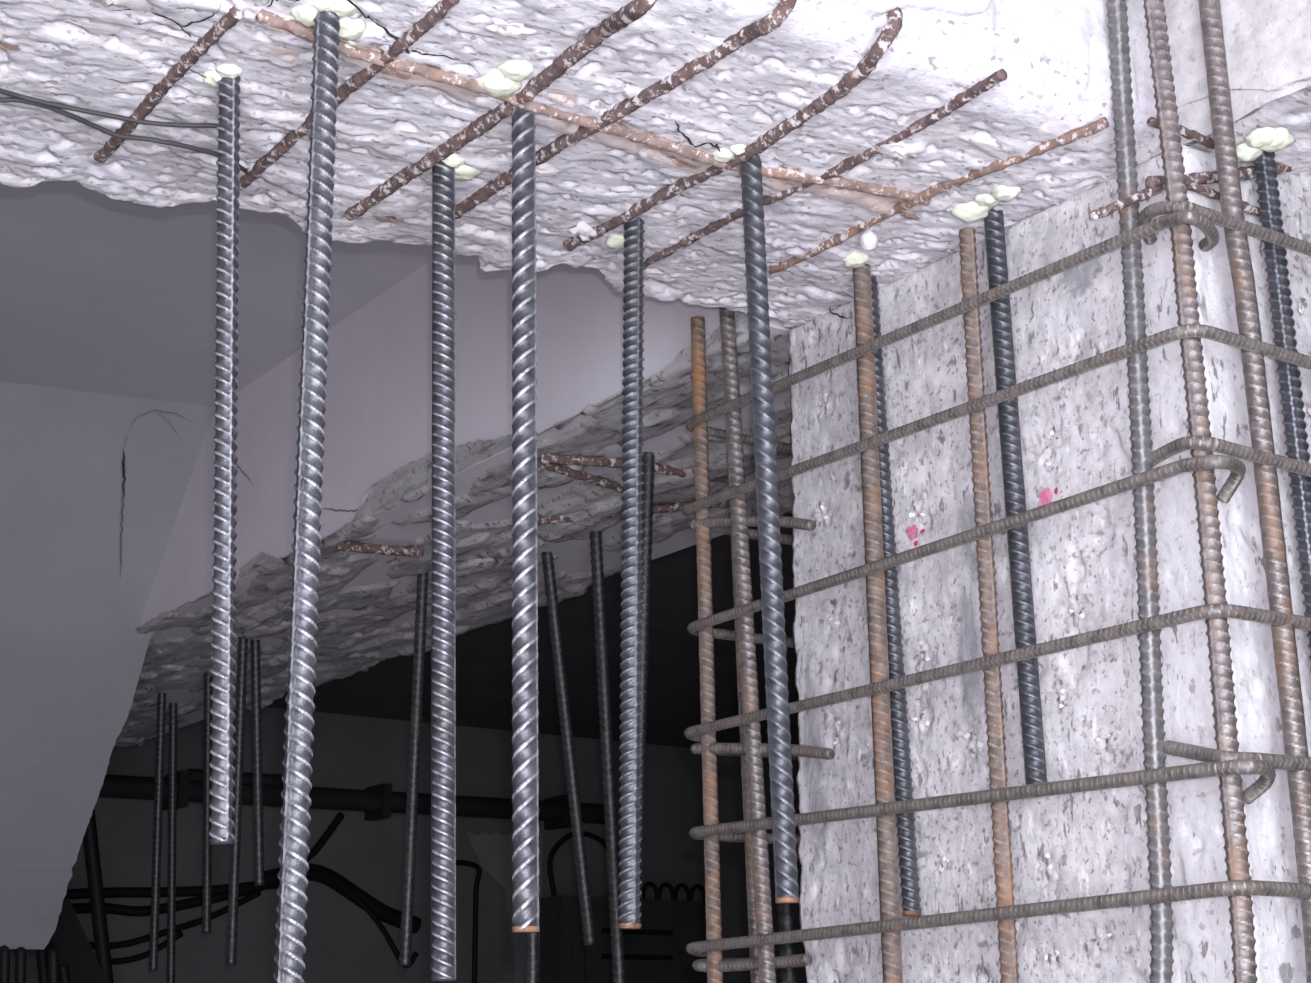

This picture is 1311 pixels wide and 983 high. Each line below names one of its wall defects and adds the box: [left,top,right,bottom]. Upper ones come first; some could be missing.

rust [94,6,315,163]
rust [238,113,311,190]
rust [336,0,1109,275]
spalling [1131,80,1162,165]
crack [119,409,190,576]
spalling [0,0,632,983]
spalling [532,0,1118,932]
spalling [779,942,796,956]
spalling [1044,950,1062,971]
spalling [1084,925,1111,958]